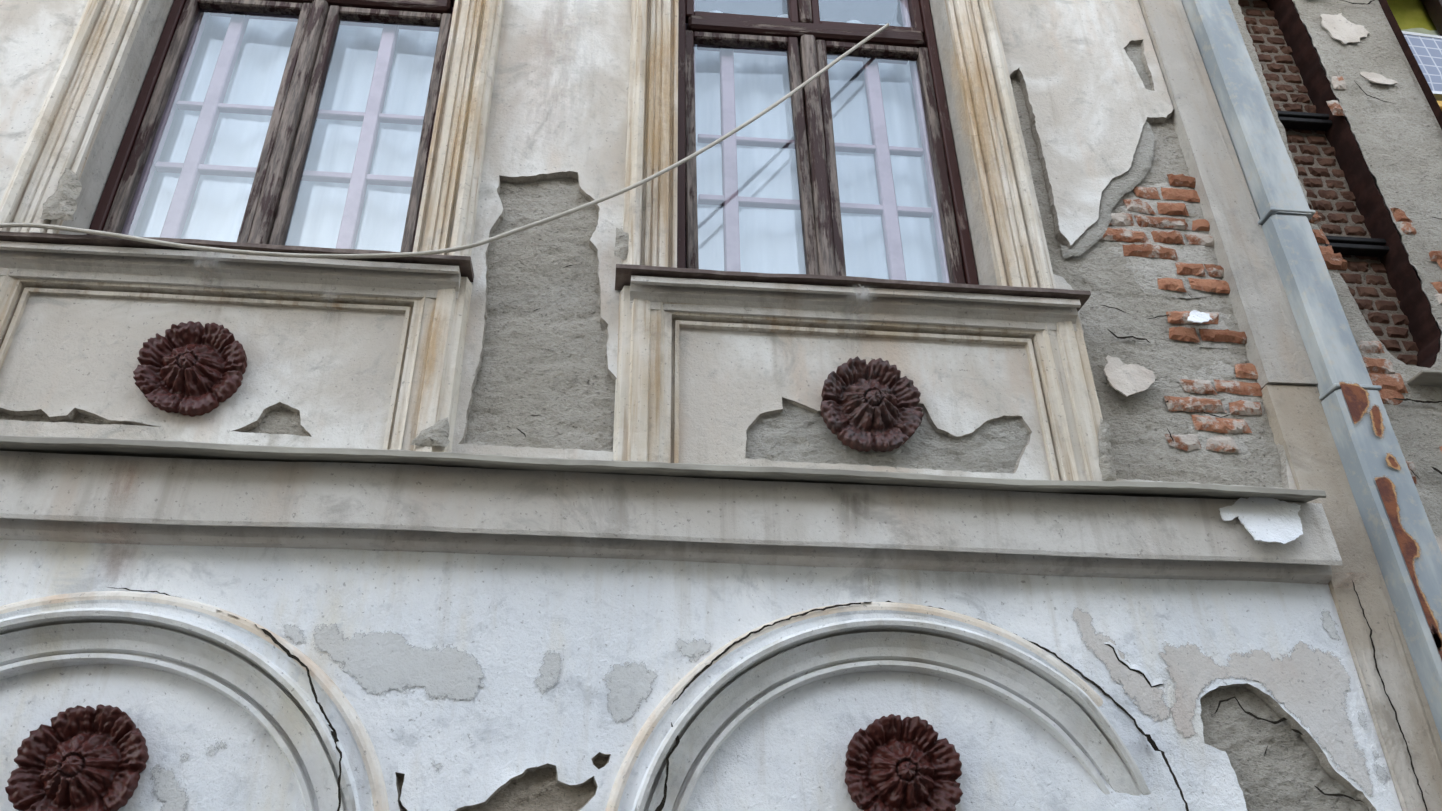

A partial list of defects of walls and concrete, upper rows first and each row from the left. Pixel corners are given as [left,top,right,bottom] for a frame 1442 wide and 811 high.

flaking render [1123,39,1155,91]
flaking render [411,171,629,452]
flaking render [1010,68,1303,545]
flaking render [745,397,1032,473]
rust [1339,382,1442,660]
peeling [284,623,485,702]
flaking render [395,772,408,811]
flaking render [455,752,611,811]
crack [655,601,891,811]
crack [979,619,1189,811]
flaking render [1073,607,1390,811]
crack [1352,581,1428,811]